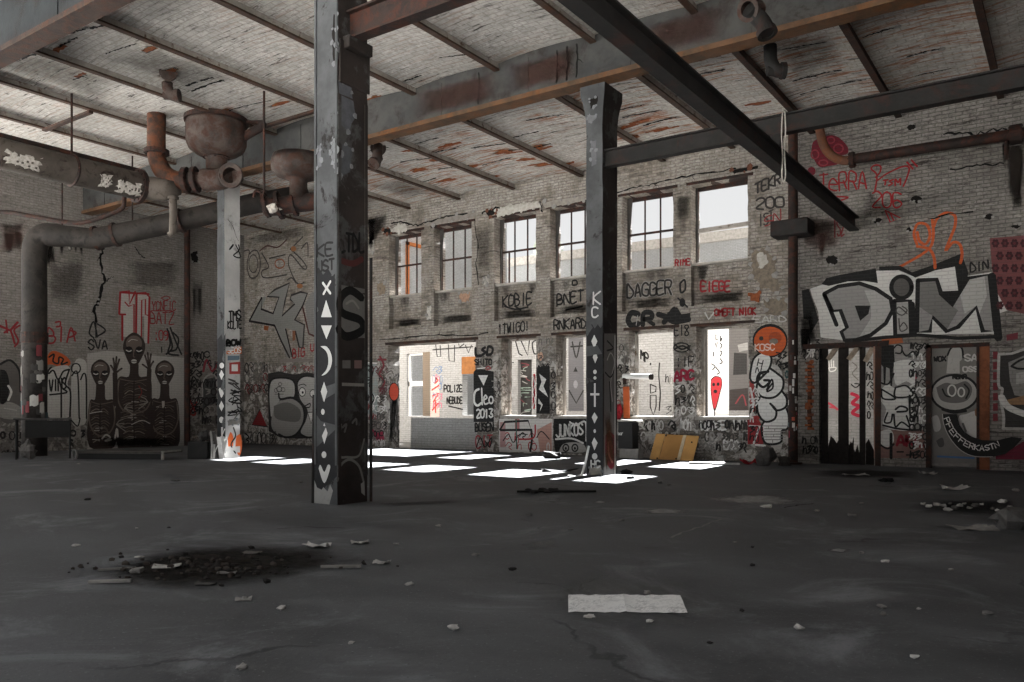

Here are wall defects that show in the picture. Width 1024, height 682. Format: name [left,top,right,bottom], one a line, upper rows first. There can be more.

corrosion [518,53,568,87]
corrosion [425,79,486,111]
peeling [315,80,357,180]
corrosion [617,118,680,140]
corrosion [410,142,461,173]
corrosion [493,144,553,167]
crack [92,247,114,323]